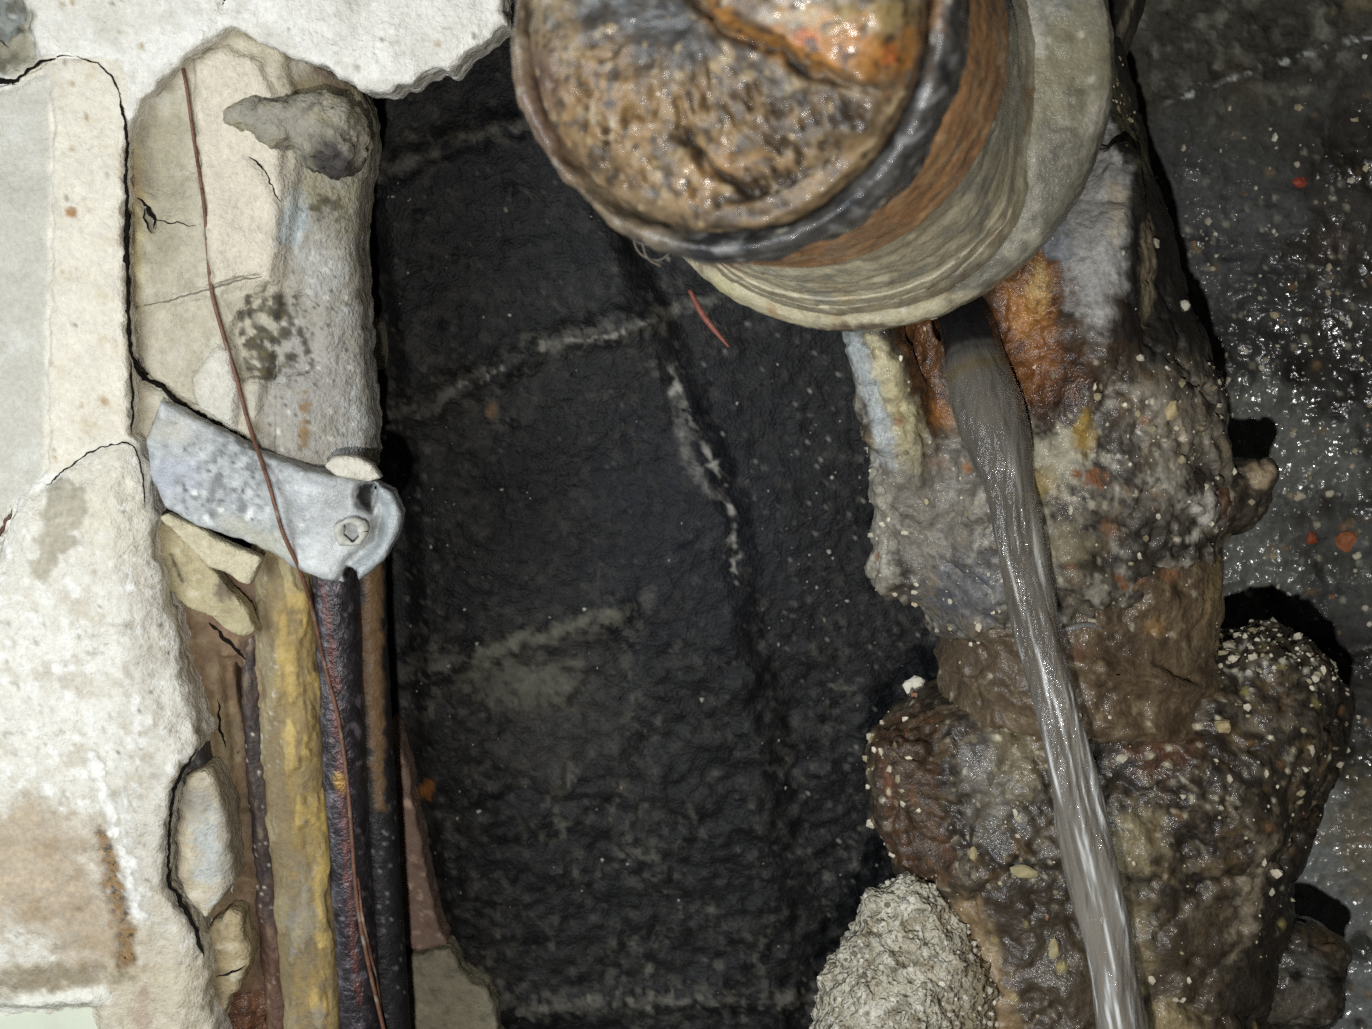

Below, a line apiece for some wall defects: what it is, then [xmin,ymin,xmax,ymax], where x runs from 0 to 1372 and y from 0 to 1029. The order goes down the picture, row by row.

peeling [373,316,388,370]
rust [898,318,949,438]
rust [991,249,1099,418]
peeling [325,454,383,481]
peeling [159,512,265,636]
spalling [176,757,246,917]
flaking render [392,712,451,951]
rust [228,990,267,1029]